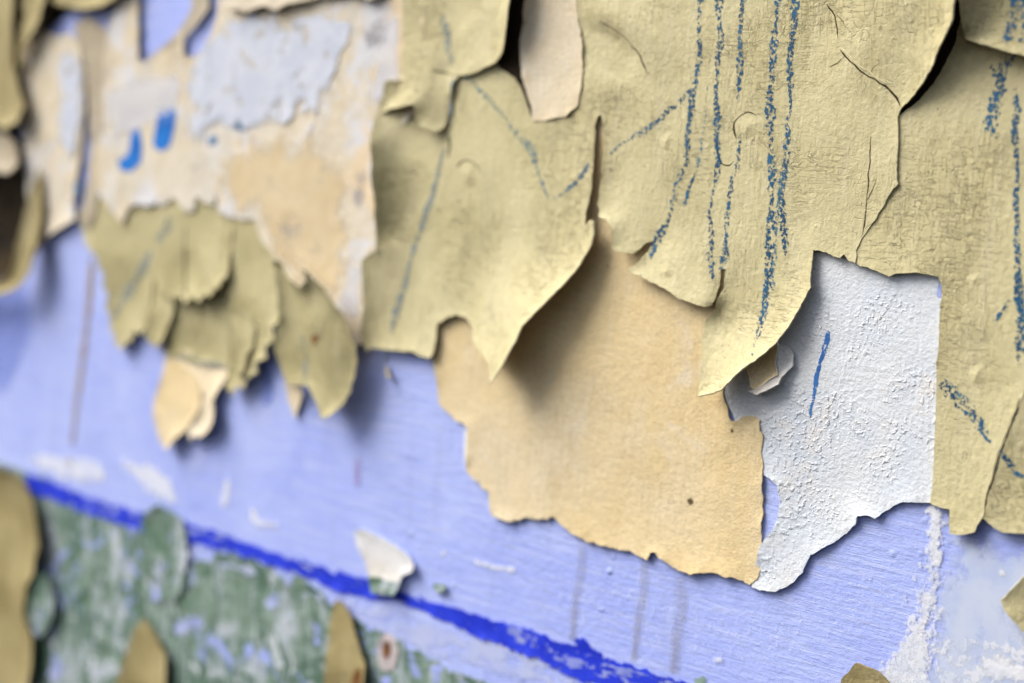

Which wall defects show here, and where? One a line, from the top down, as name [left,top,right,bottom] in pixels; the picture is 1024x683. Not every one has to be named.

crack [827,5,900,106]
peeling [0,0,403,450]
crack [862,138,876,234]
peeling [355,0,1024,596]
peeling [0,467,55,683]
peeling [115,618,167,683]
peeling [137,504,188,603]
peeling [323,600,366,683]
efflorescence [879,505,1024,683]